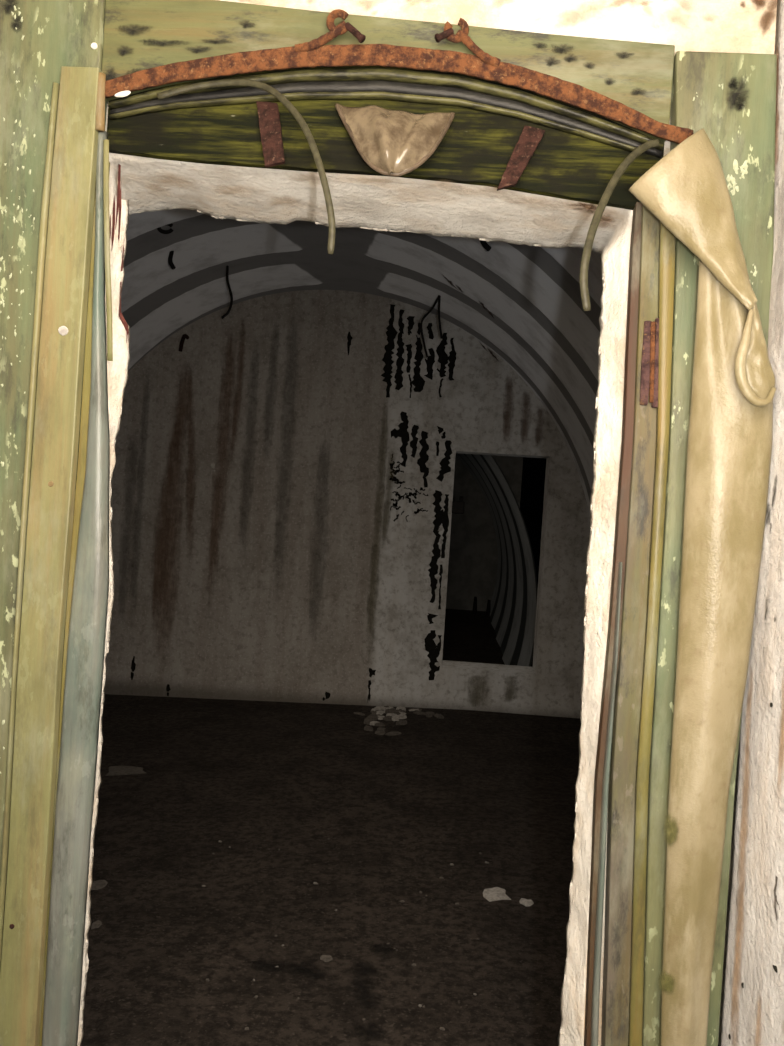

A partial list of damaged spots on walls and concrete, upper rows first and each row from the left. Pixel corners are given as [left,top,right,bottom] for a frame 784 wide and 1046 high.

peeling [726,159,748,196]
peeling [0,190,35,350]
peeling [381,304,456,398]
peeling [391,411,452,680]